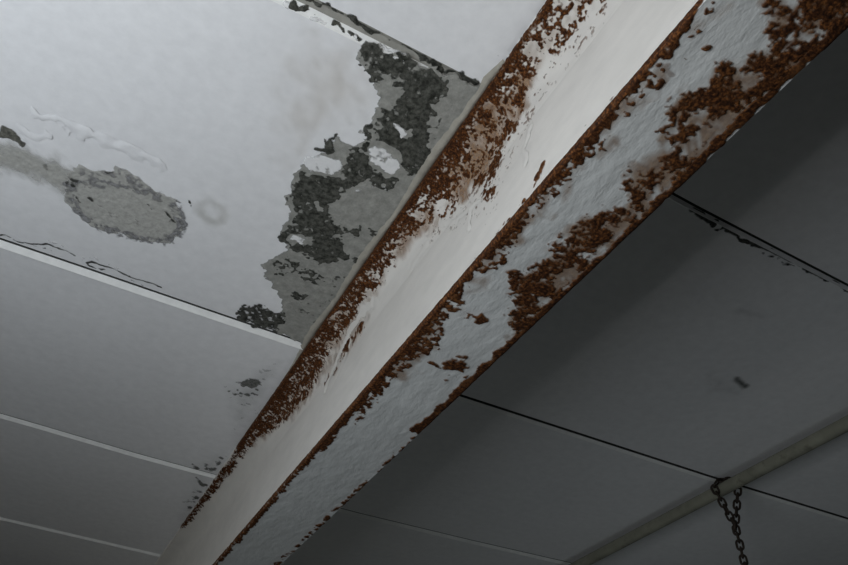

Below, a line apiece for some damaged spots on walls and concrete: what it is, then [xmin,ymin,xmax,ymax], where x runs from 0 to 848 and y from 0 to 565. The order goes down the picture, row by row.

peeling [0,126,25,147]
leakage [0,145,73,191]
flaking render [63,165,188,245]
peeling [235,0,481,344]
corrosion [180,0,848,565]